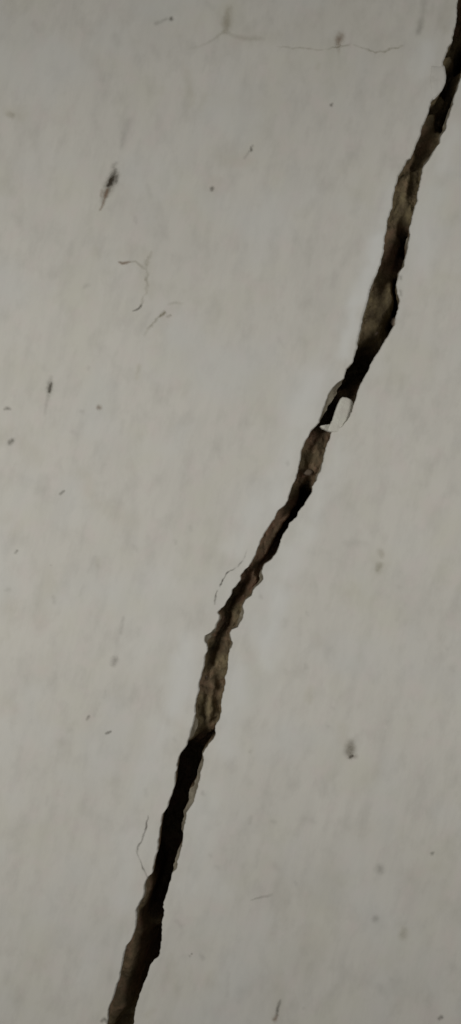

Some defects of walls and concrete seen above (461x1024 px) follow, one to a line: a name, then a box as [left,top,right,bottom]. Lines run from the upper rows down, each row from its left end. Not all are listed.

crack [108,0,461,1024]